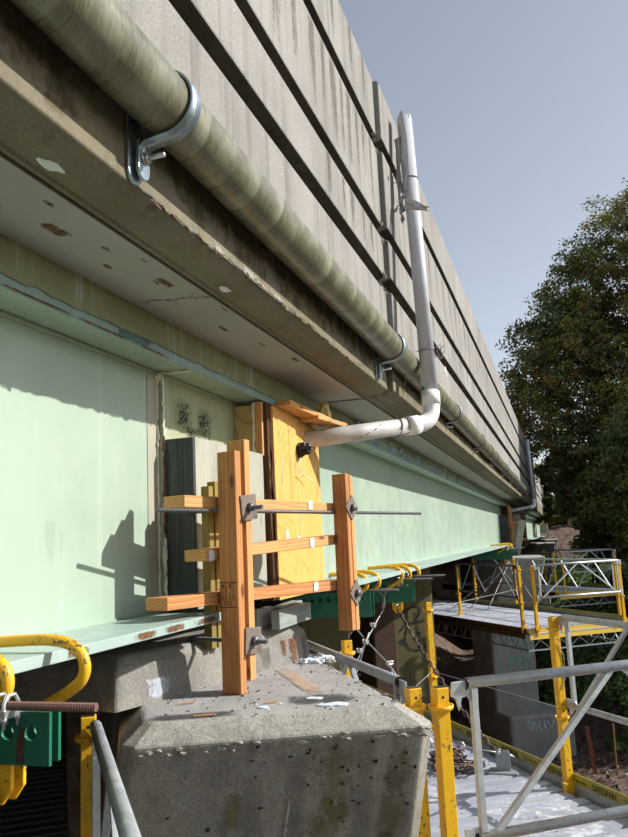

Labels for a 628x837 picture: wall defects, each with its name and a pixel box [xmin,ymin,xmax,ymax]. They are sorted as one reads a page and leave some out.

corrosion [41,224,69,236]
peeling [0,263,287,401]